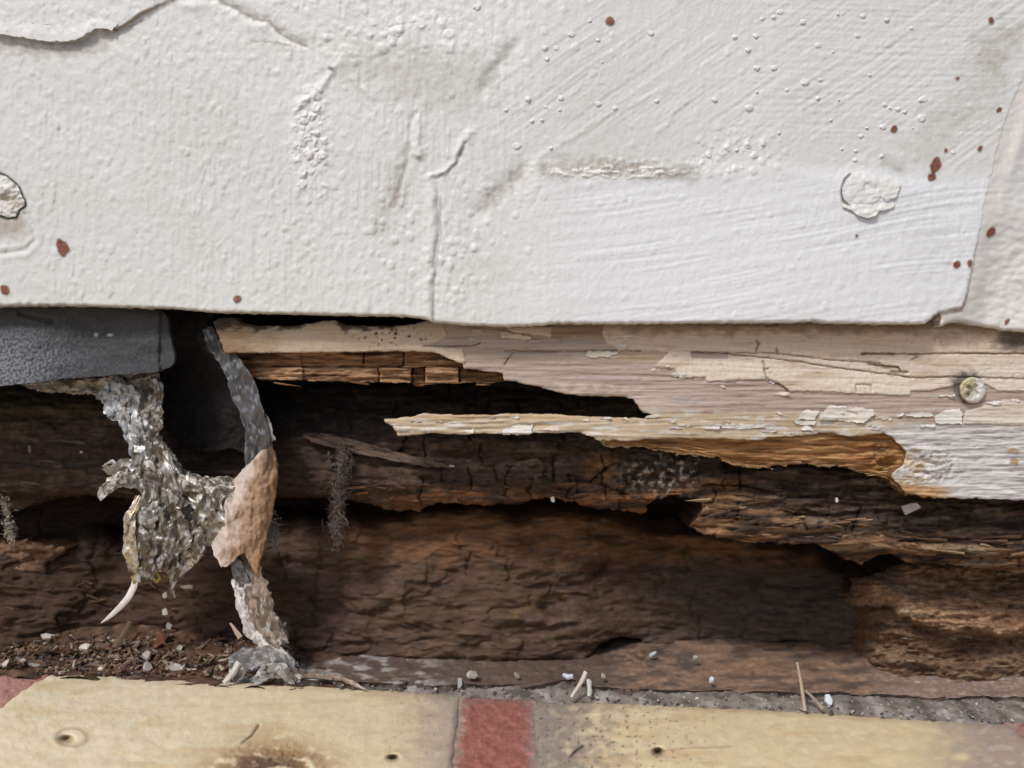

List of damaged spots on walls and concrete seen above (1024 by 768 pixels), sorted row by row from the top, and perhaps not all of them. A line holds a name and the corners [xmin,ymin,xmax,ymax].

crack [0,0,172,42]
crack [220,0,304,45]
rust [928,148,947,181]
peeling [0,172,26,219]
rust [56,239,69,257]
peeling [586,335,637,358]
crack [859,353,1024,377]
peeling [502,415,560,435]
spalling [600,394,963,499]
peeling [162,592,173,630]
peeling [167,645,187,671]
peeling [458,670,478,689]